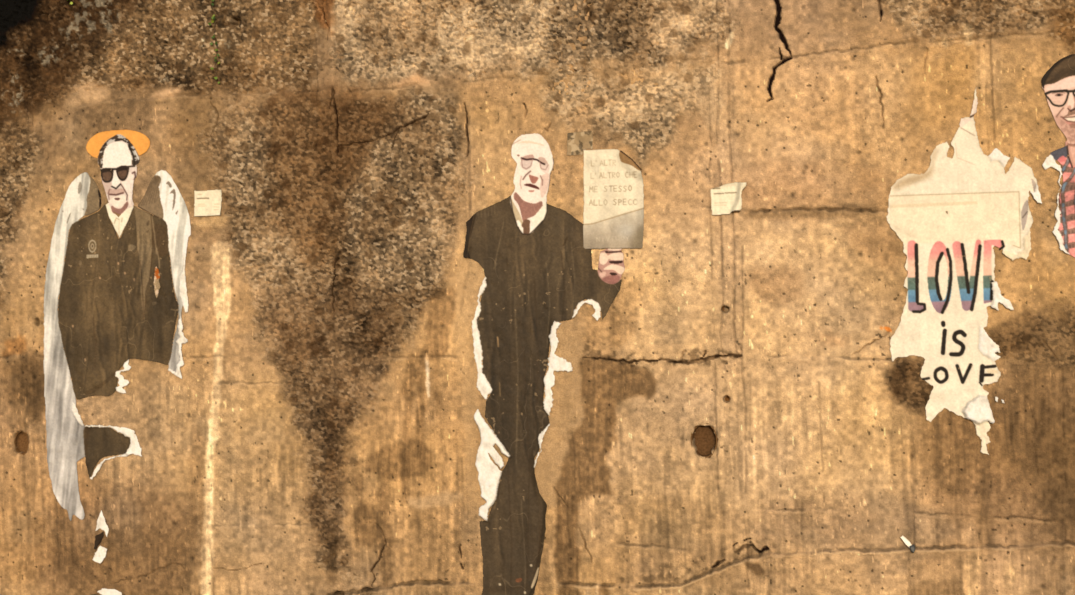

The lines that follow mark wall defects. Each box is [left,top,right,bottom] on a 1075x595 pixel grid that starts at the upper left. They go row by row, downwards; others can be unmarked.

crack [766,0,793,102]
leakage [318,279,463,595]
leakage [546,265,666,595]
leakage [919,342,1075,595]